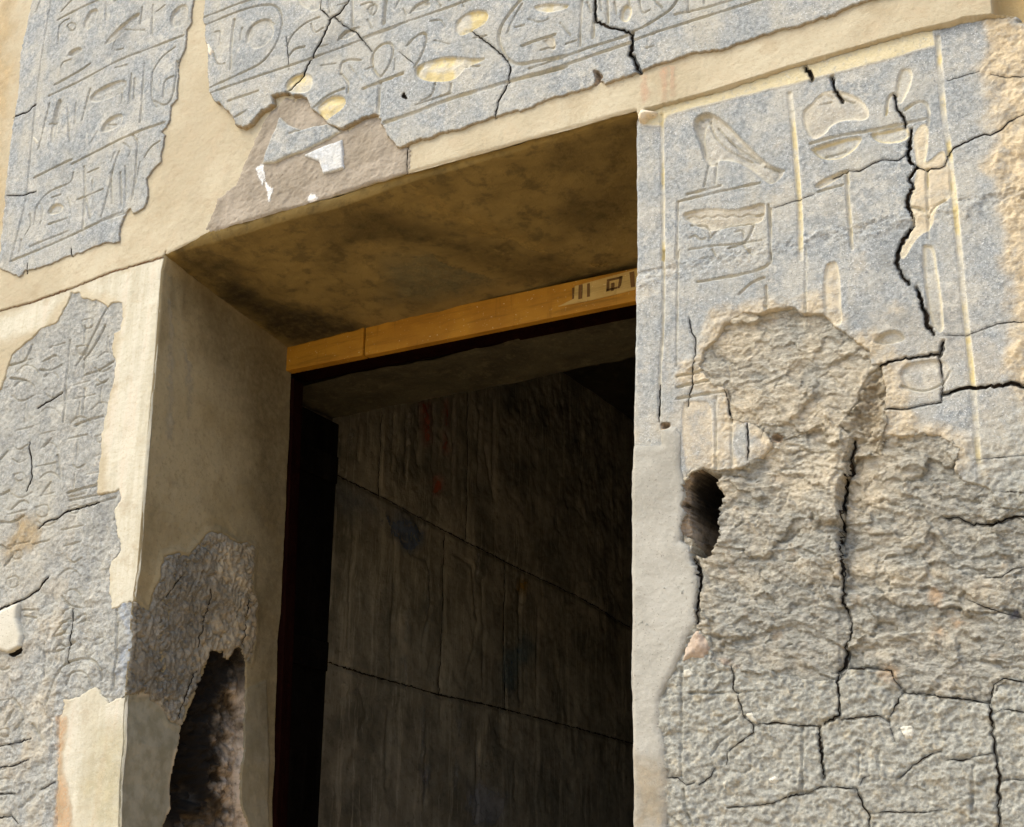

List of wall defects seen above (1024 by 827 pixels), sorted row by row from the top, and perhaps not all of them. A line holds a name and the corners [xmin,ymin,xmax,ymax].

crack [286,0,371,94]
crack [472,31,511,118]
crack [594,0,642,74]
crack [805,67,843,103]
crack [834,94,1024,410]
spalling [681,309,1024,703]
crack [667,441,1024,827]
spalling [163,647,248,827]
peeling [900,726,915,739]